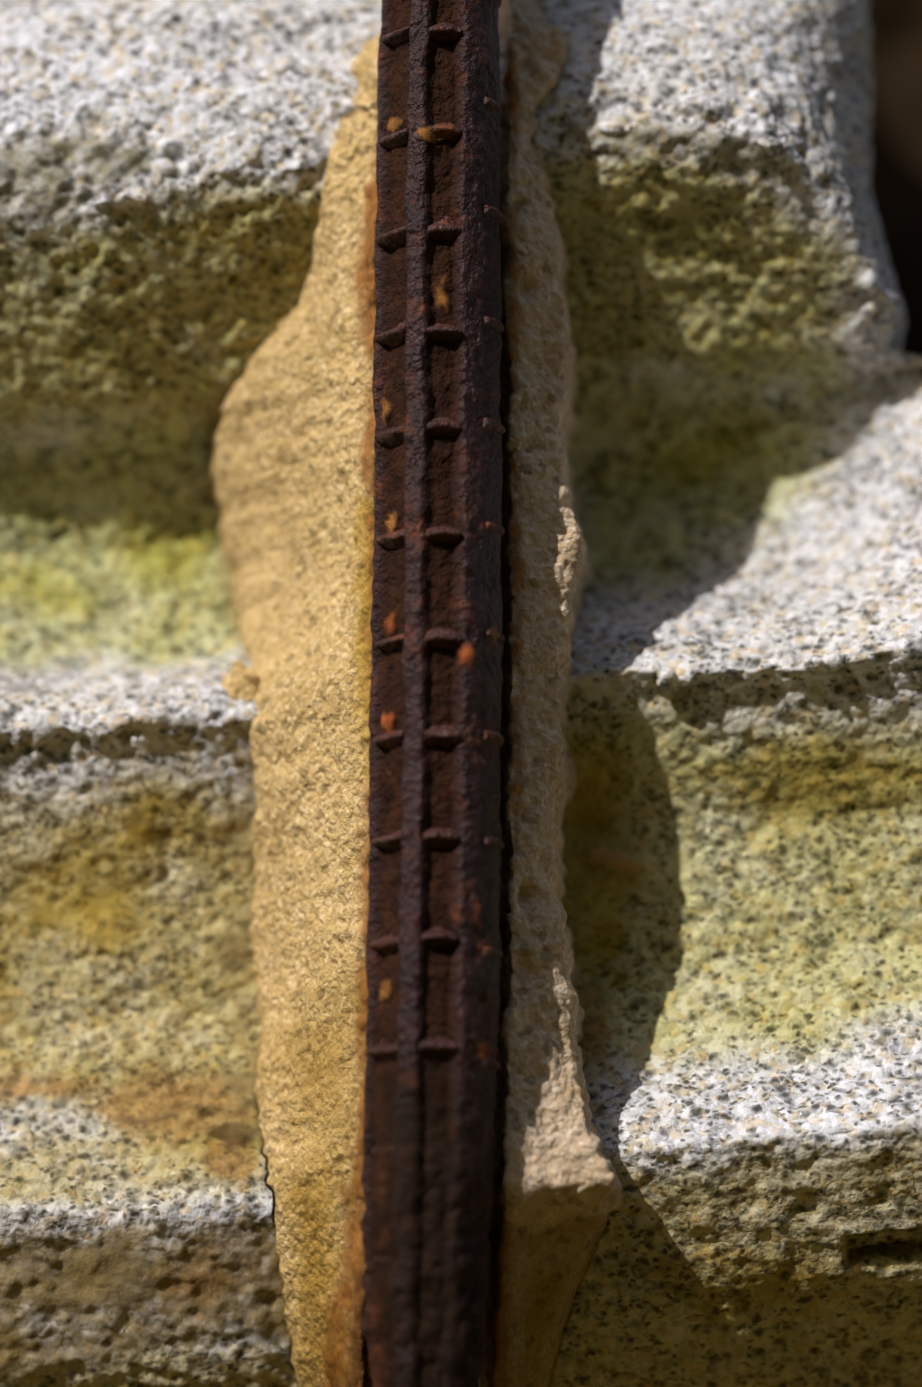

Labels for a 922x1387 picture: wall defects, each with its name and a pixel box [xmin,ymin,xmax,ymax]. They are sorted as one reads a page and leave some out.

corrosion [418,128,440,142]
corrosion [356,160,377,357]
corrosion [361,395,389,496]
corrosion [365,513,395,670]
corrosion [460,645,474,662]
corrosion [381,713,393,728]